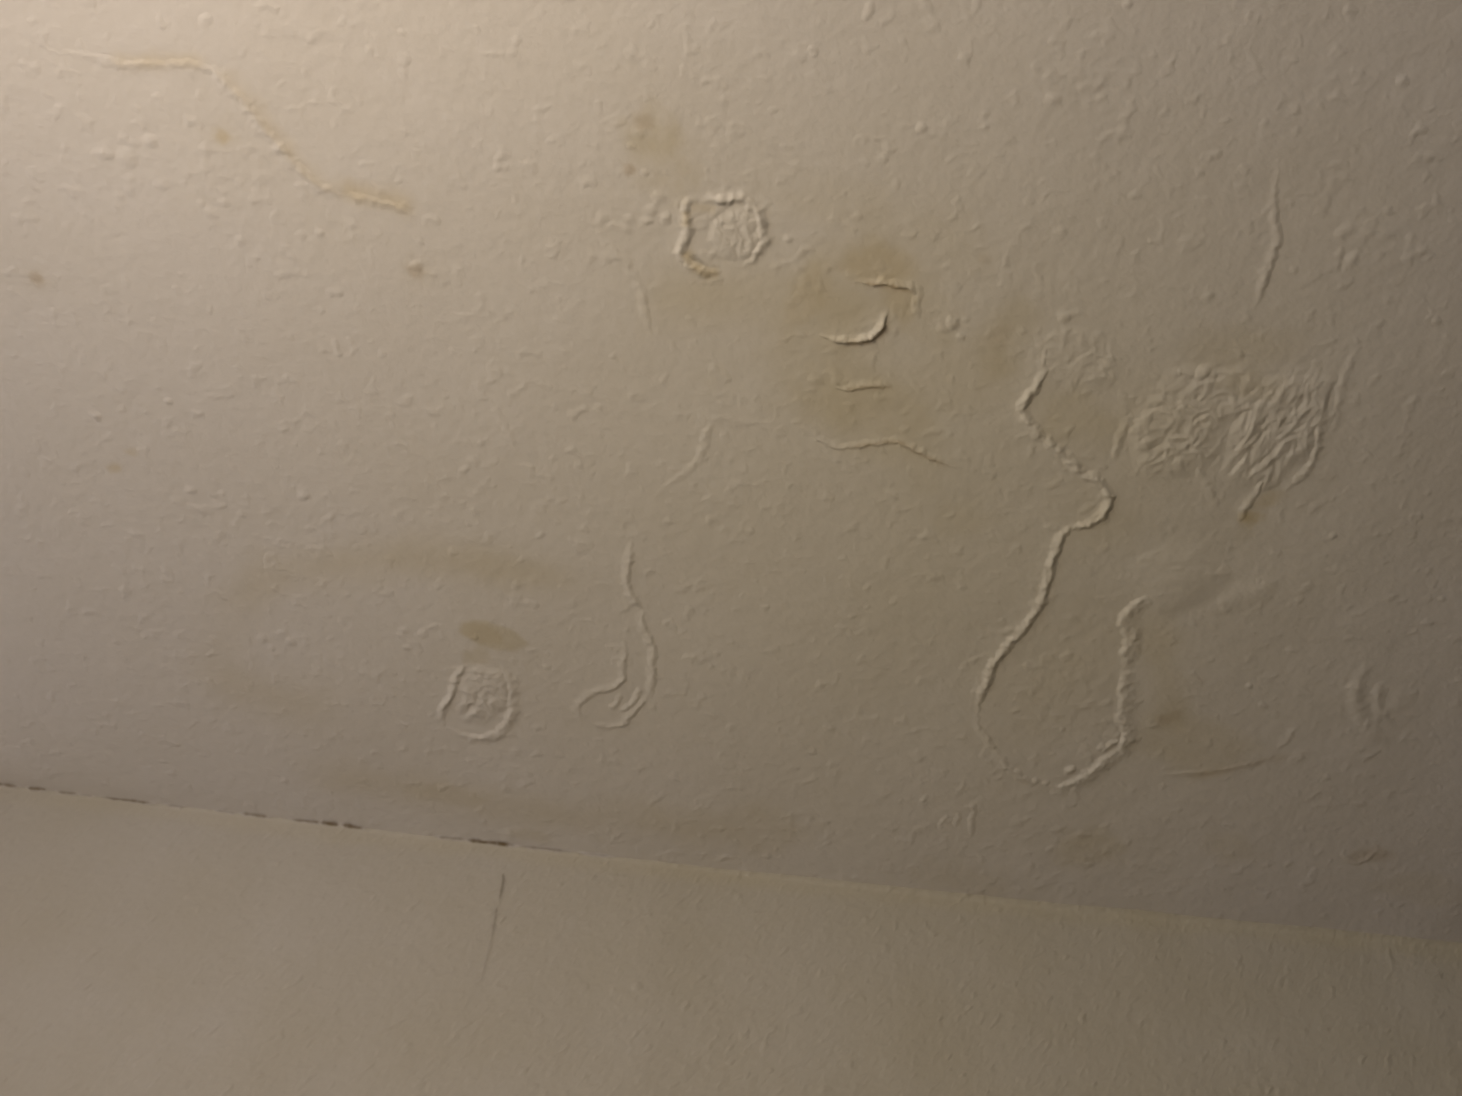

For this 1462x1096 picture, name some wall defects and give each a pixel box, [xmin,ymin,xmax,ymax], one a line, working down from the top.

peeling [663,184,777,285]
peeling [817,308,888,343]
peeling [959,324,1170,802]
crack [0,782,365,830]